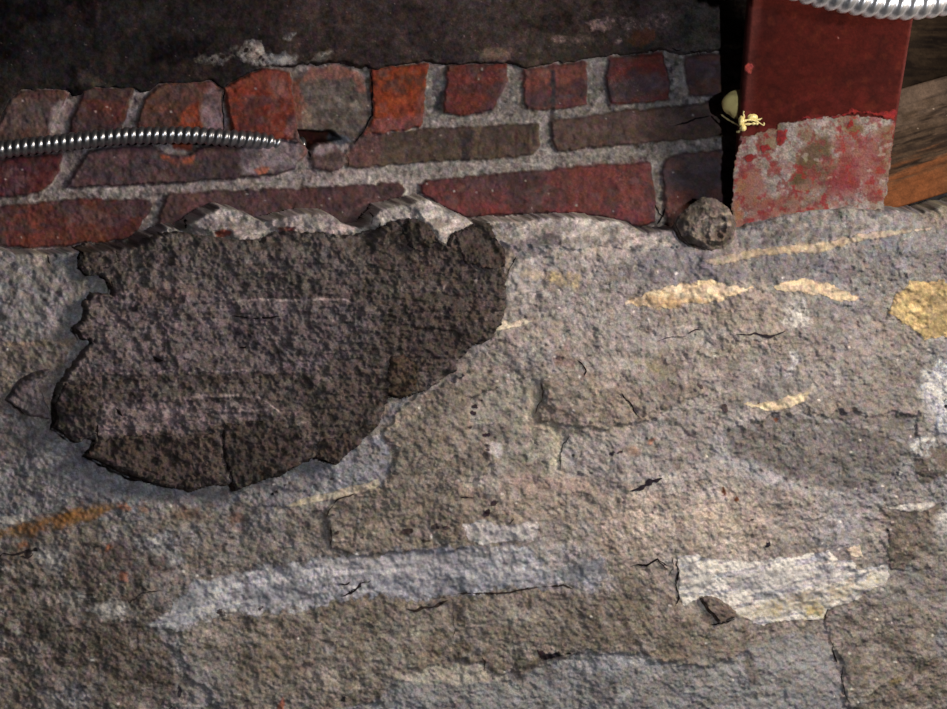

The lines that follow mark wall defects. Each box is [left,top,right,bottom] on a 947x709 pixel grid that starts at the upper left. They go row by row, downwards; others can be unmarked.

peeling [731,108,896,227]